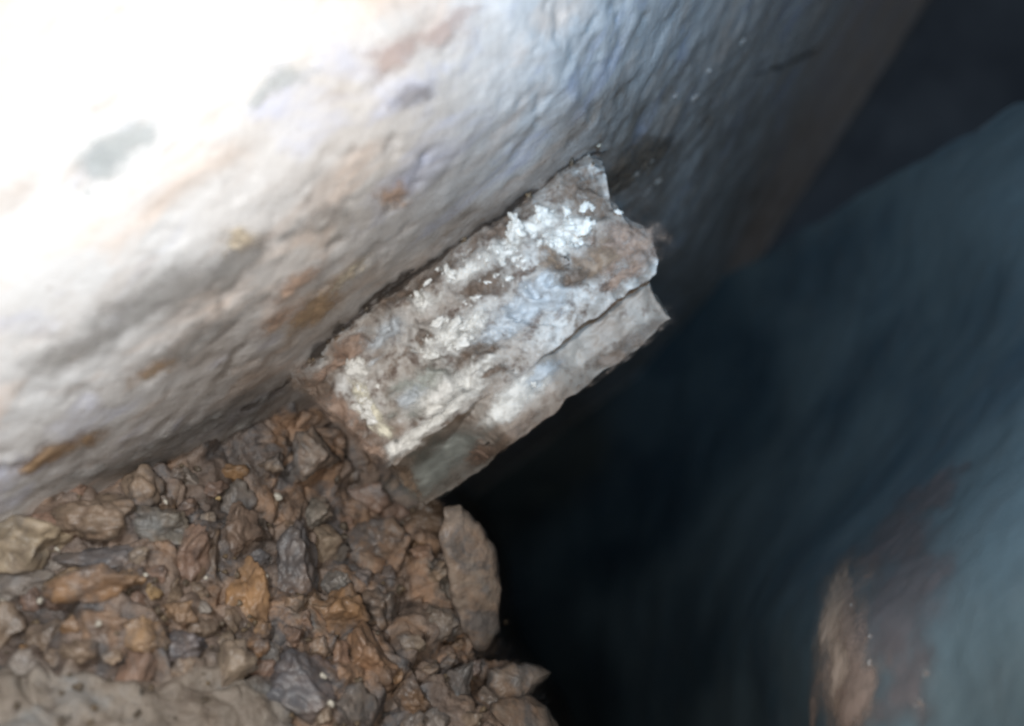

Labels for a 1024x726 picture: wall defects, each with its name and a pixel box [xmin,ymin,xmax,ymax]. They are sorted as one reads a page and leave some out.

crack [240,150,607,411]
damp [345,201,597,496]